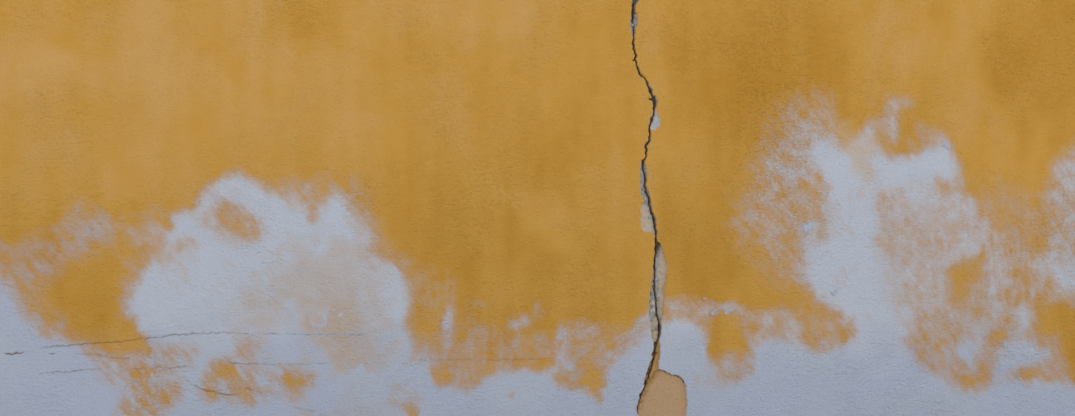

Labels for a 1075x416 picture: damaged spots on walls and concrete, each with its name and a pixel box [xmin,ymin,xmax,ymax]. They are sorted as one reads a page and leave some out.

peeling [0,162,655,416]
crack [631,0,662,414]
peeling [637,77,1075,416]